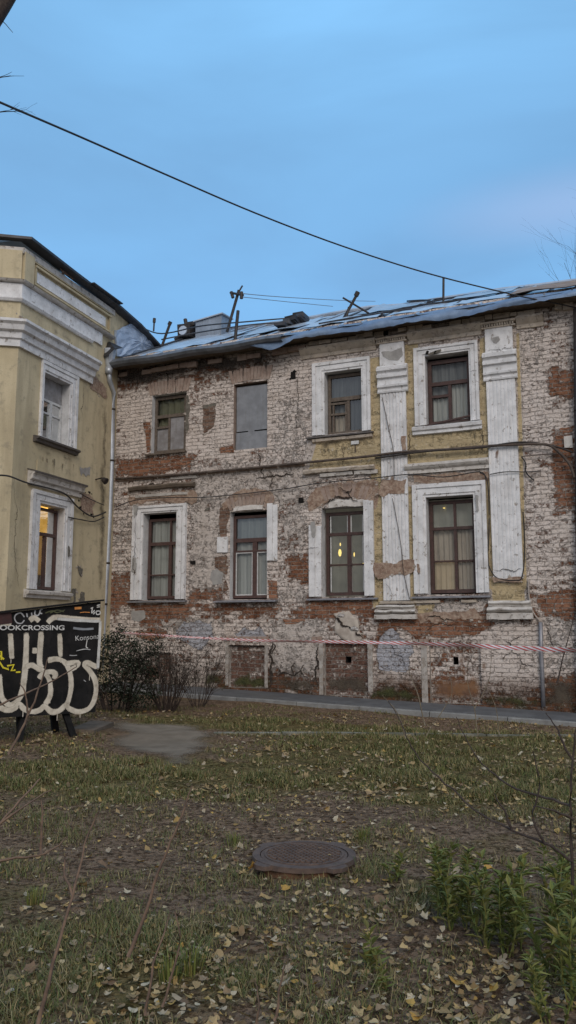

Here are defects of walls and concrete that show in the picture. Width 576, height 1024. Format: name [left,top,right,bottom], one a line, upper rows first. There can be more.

flaking render [547,366,572,399]
spalling [184,395,216,435]
flaking render [143,420,152,453]
spalling [127,486,274,537]
spalling [298,469,489,538]
flaking render [290,561,309,583]
spalling [371,559,420,579]
peeling [221,580,372,650]
crack [269,642,319,688]